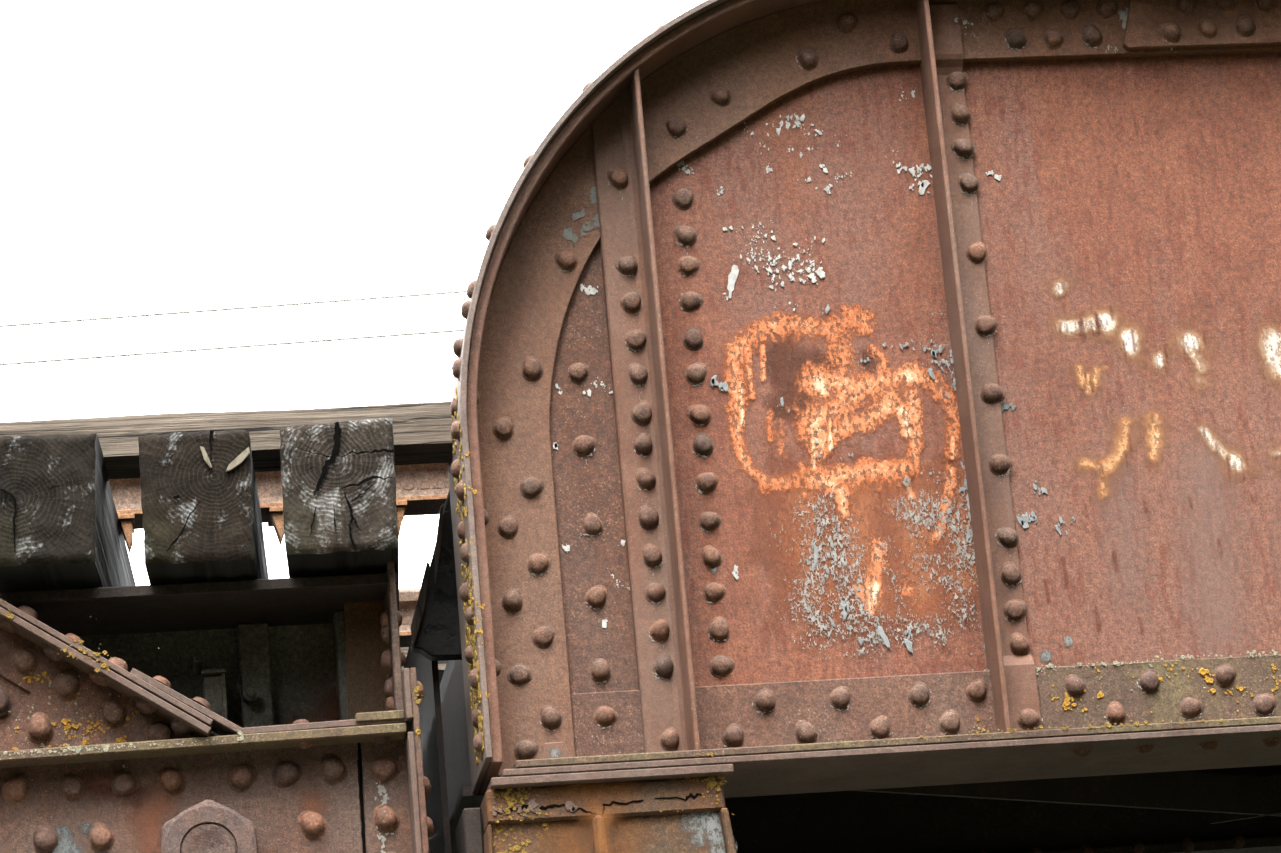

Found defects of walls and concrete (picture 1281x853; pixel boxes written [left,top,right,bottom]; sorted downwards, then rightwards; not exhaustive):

peeling [744,114,823,174]
peeling [797,164,852,194]
peeling [885,150,932,195]
peeling [722,221,825,311]
peeling [852,331,956,408]
rust [1056,305,1206,370]
rust [1258,330,1281,380]
rust [722,304,979,636]
rust [1080,419,1132,495]
rust [1148,413,1161,461]
rust [1200,427,1247,477]
peeling [765,461,985,673]